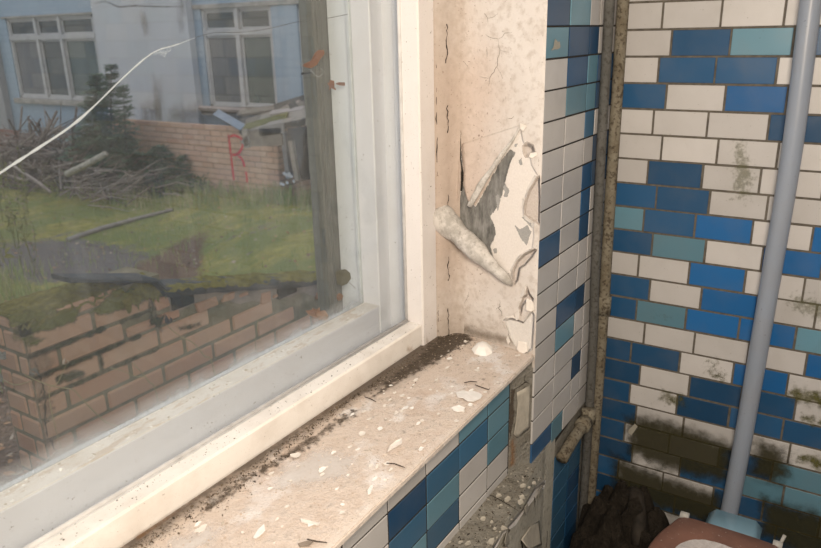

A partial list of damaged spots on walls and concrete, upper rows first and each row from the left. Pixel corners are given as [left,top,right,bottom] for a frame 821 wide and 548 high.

peeling [433,123,541,356]
peeling [492,480,546,548]
water stain [614,417,732,521]
water stain [753,444,789,482]